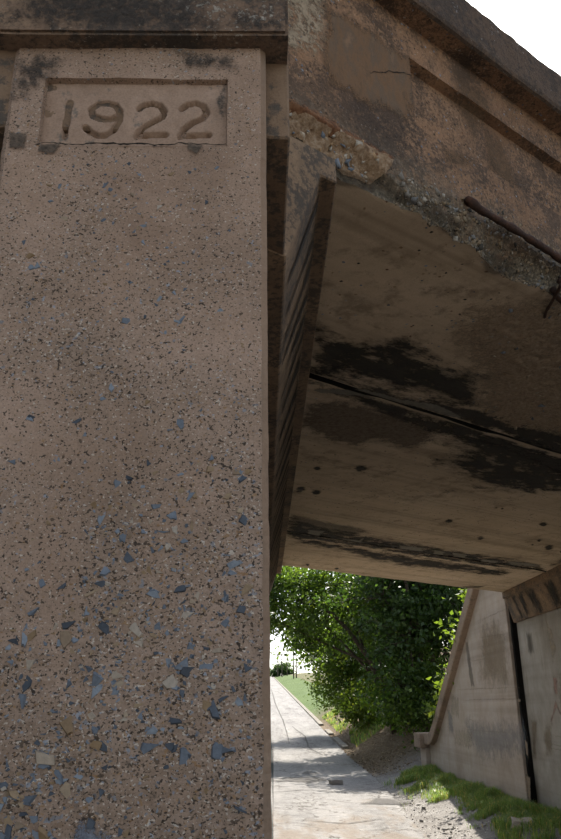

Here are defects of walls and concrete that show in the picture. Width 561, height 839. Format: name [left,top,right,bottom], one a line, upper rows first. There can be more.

spalling [289,110,394,185]
leakage [271,198,561,582]
spalling [395,171,561,435]